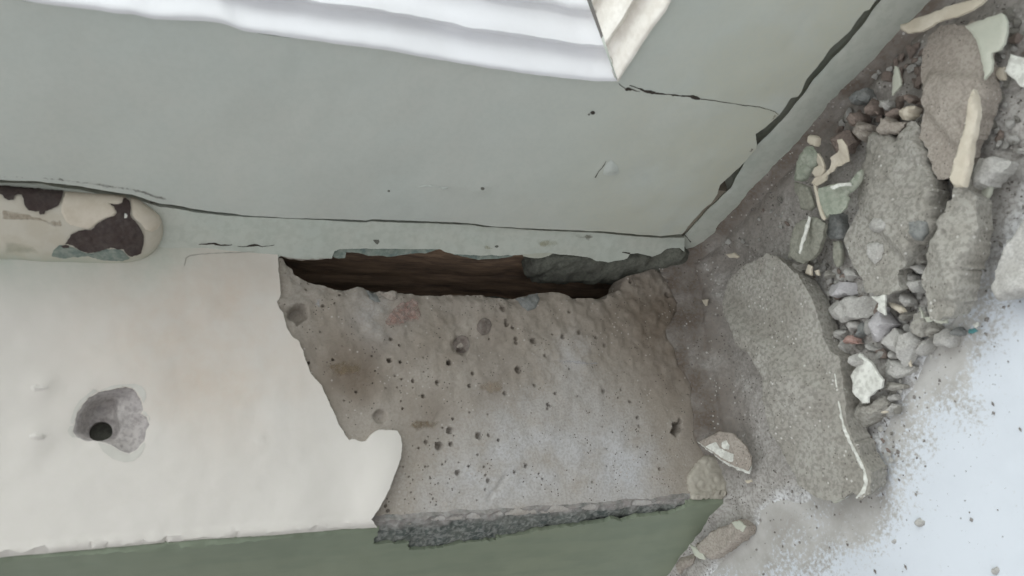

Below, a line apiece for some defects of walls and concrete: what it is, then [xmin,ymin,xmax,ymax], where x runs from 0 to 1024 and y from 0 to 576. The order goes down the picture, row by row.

crack [610,57,777,114]
peeling [0,185,162,261]
peeling [68,384,150,437]
spalling [277,240,753,547]
peeling [98,442,145,462]